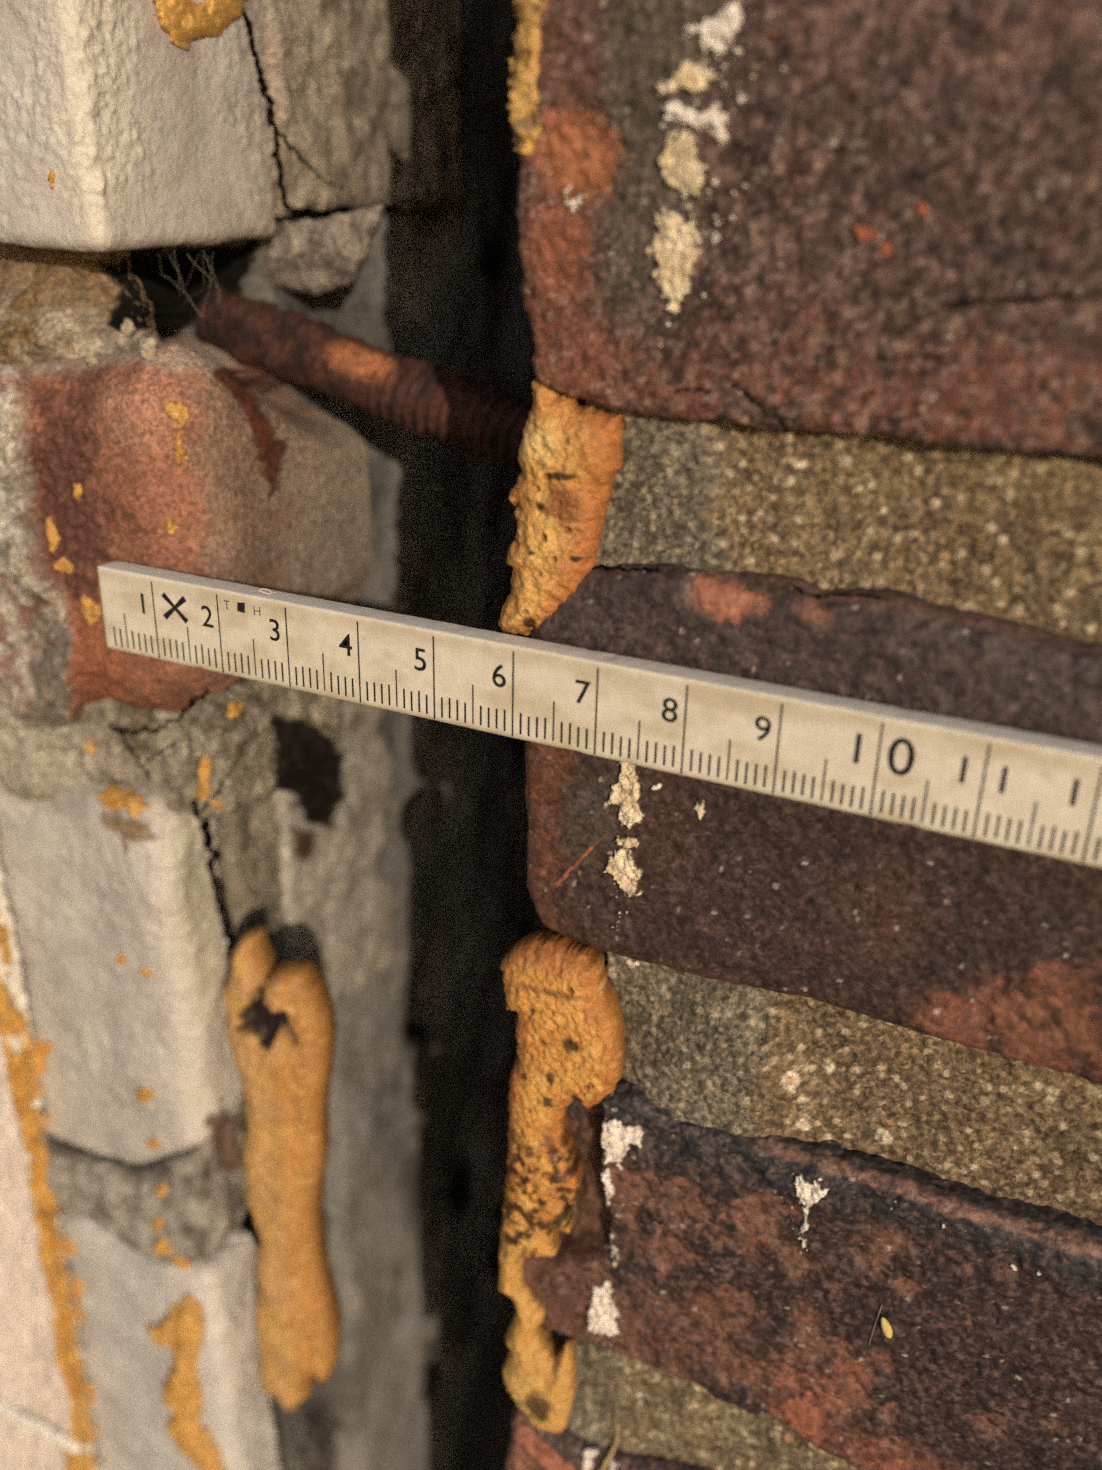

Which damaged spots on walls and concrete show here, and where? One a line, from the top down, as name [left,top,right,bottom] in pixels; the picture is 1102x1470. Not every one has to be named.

crack [242,6,423,215]
rust [214,368,287,496]
crack [108,689,209,781]
crack [190,782,236,963]